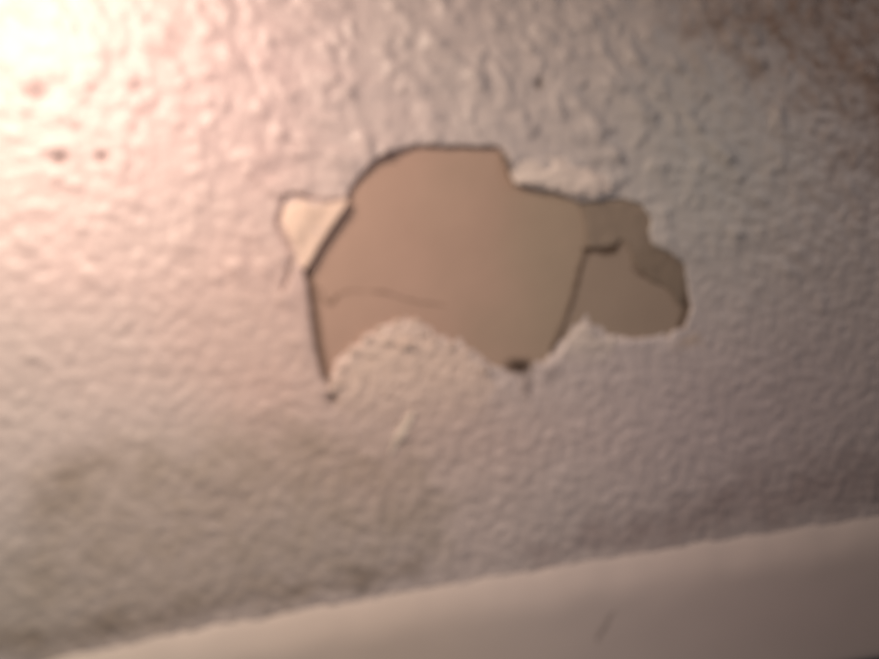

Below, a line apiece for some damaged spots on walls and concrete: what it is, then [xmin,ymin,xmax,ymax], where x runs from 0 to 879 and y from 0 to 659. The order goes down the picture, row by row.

peeling [282,146,691,443]